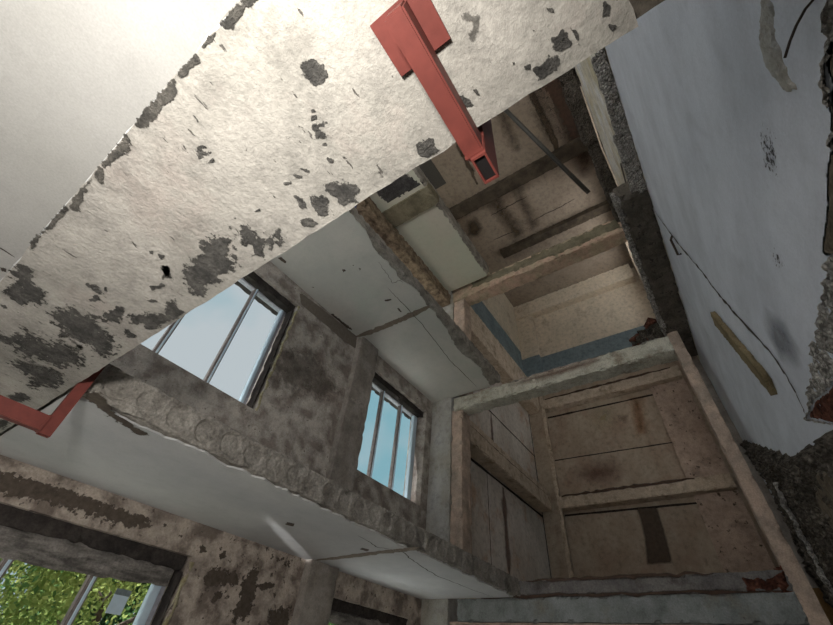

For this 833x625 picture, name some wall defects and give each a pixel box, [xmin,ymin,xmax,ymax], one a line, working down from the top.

peeling [759,0,814,92]
spalling [30,0,256,249]
spalling [311,109,327,145]
spalling [293,179,360,227]
spalling [0,218,285,402]
spalling [740,385,833,608]
peeling [203,551,275,625]
peeling [267,605,293,625]